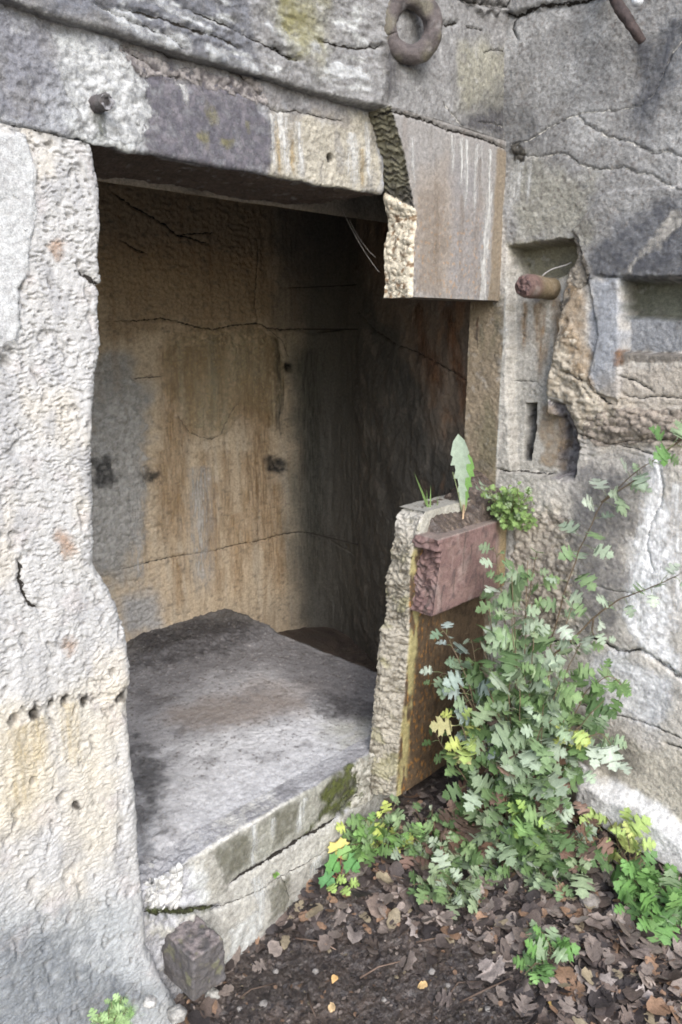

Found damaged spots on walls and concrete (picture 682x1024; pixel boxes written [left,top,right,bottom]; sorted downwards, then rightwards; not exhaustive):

crack [373,103,679,190]
crack [116,195,216,245]
crack [107,251,467,380]
crack [17,559,37,608]
crack [103,532,358,573]
crack [144,817,336,916]